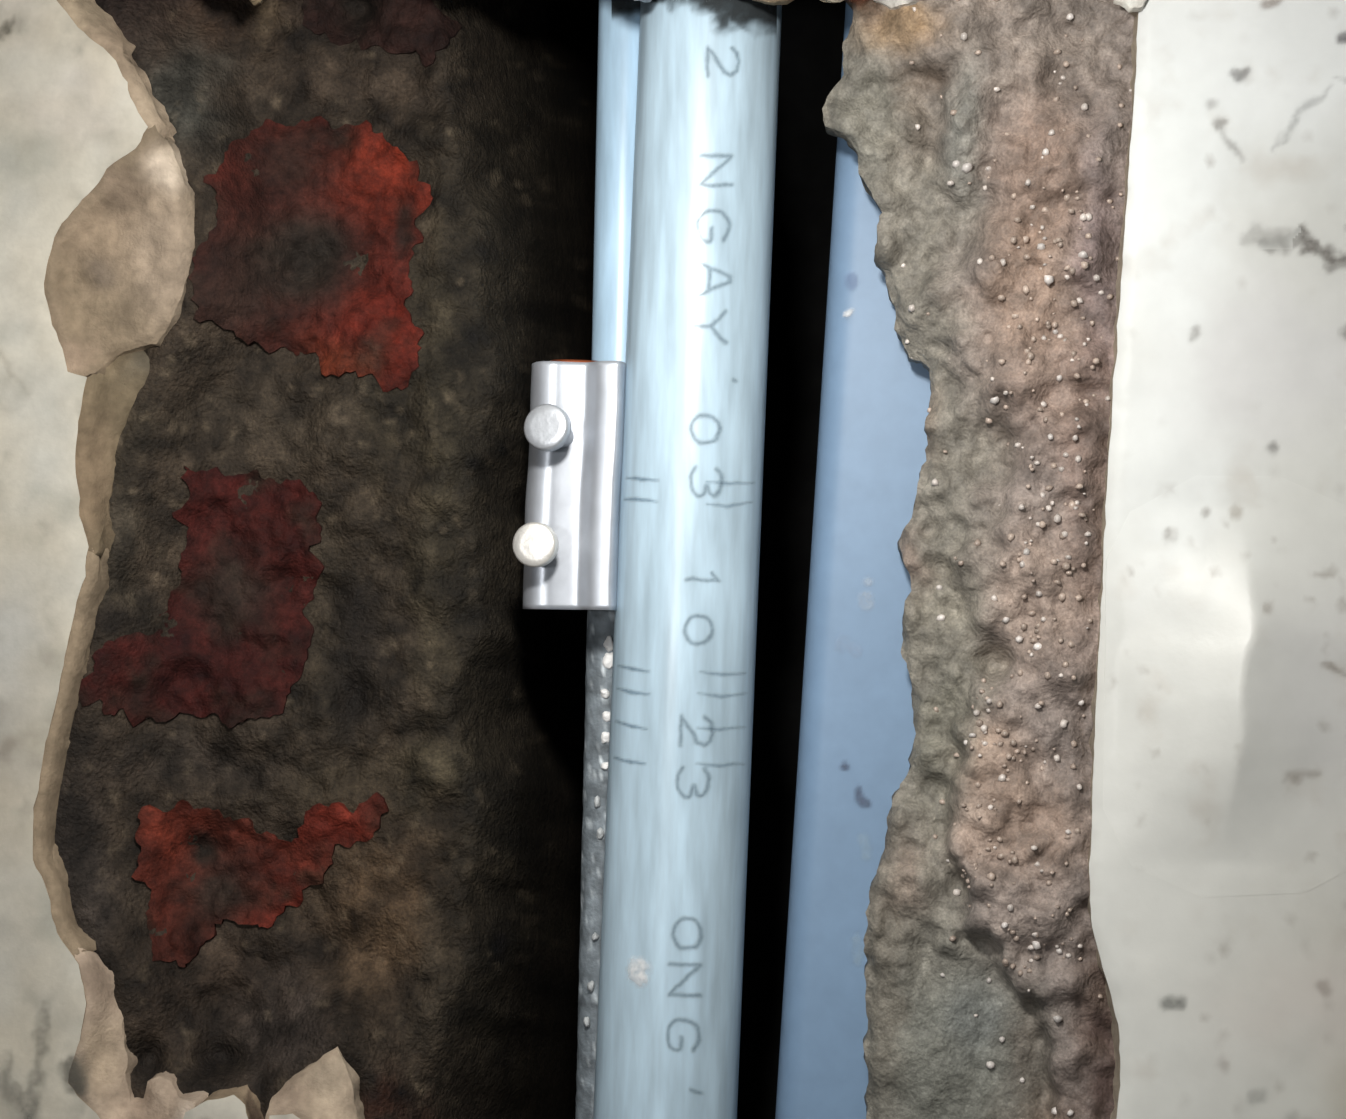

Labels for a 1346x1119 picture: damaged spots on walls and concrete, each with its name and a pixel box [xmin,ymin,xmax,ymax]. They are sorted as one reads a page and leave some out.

spalling [33,0,599,1119]
spalling [820,0,1147,1119]